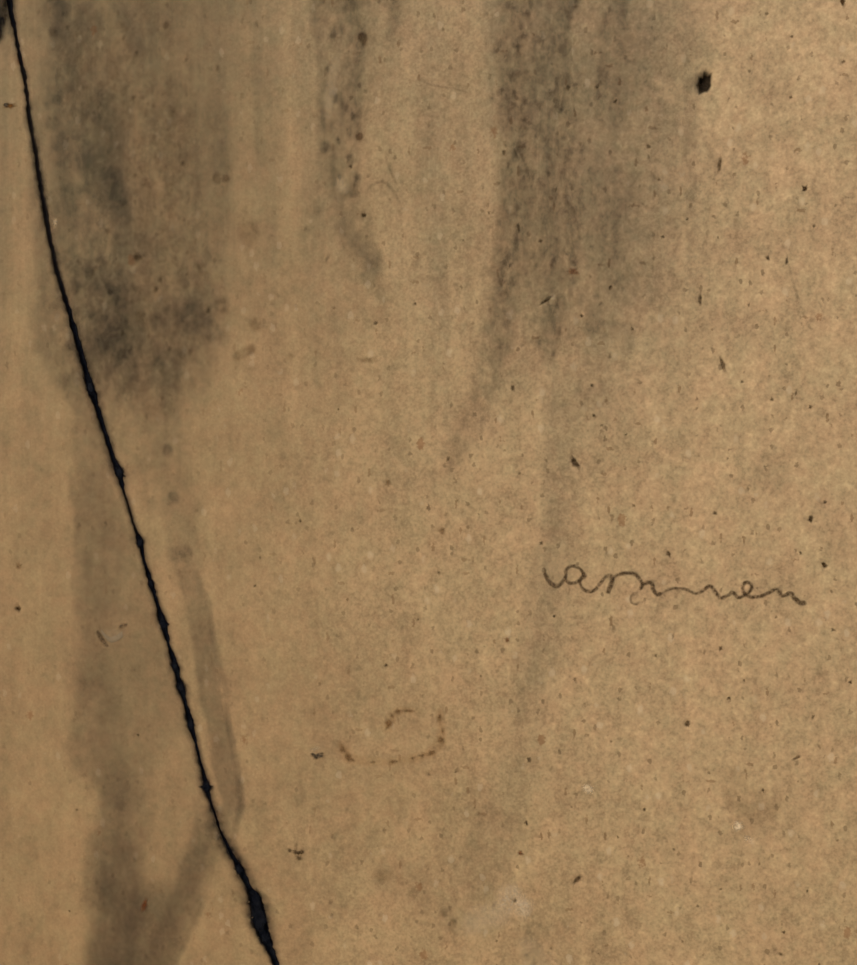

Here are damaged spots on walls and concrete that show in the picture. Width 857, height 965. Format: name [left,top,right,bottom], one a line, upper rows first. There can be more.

crack [6,0,279,965]